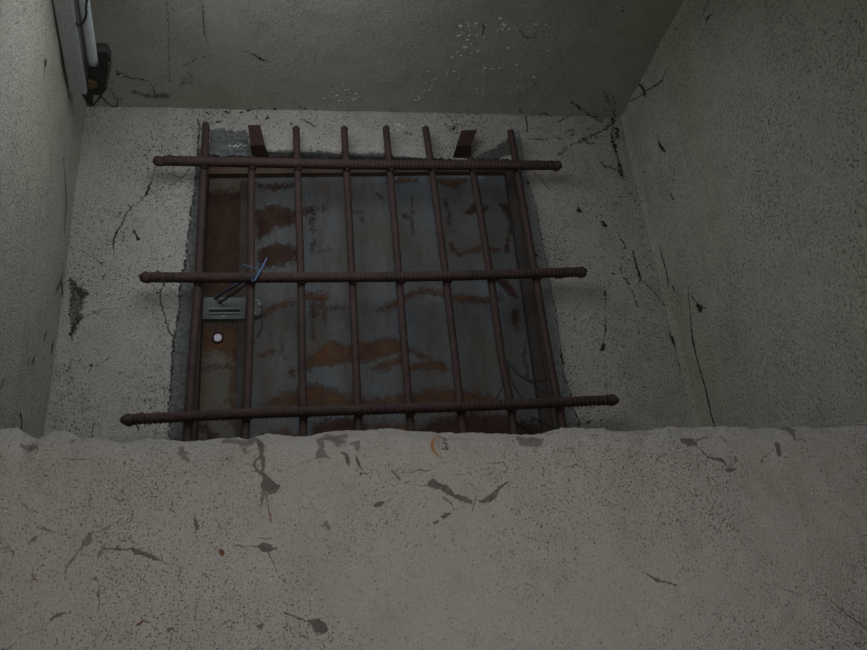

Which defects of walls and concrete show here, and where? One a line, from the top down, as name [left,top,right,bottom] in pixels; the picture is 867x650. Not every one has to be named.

crack [624,71,666,111]
rust [255,205,295,240]
rust [202,322,238,354]
rust [306,337,429,370]
crack [608,232,715,426]